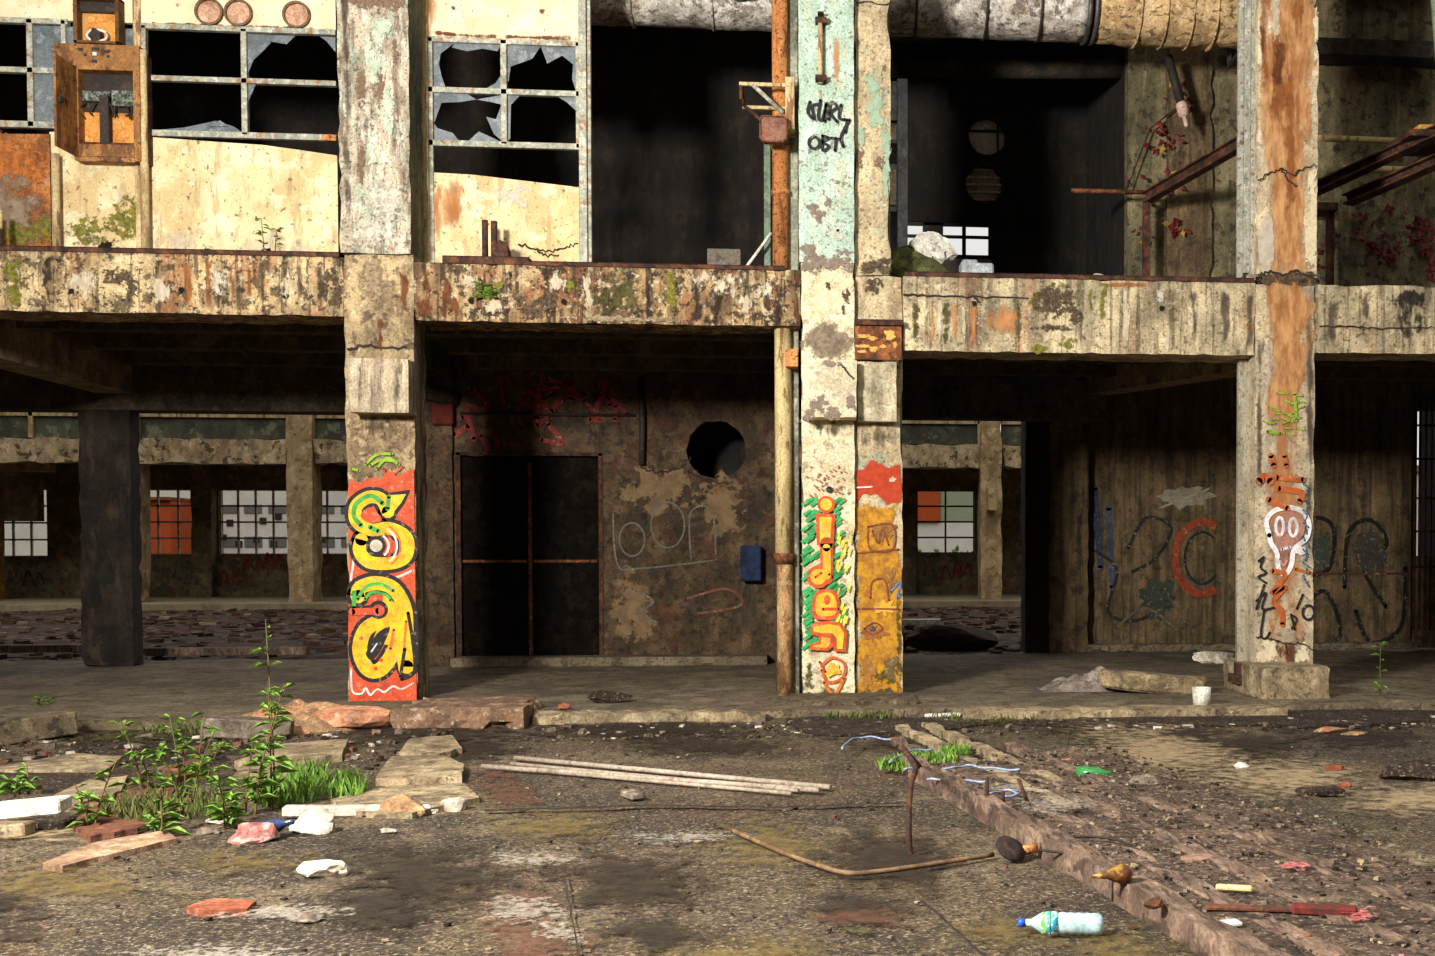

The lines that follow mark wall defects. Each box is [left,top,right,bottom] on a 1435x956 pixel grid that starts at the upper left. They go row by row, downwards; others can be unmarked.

peeling [340,0,405,189]
corrosion [0,133,51,191]
crack [1258,163,1318,187]
peeling [806,180,840,223]
spalling [98,269,138,301]
spalling [511,289,559,319]
water stain [912,303,920,342]
water stain [937,301,966,343]
water stain [1221,293,1229,339]
corrosion [1250,0,1315,529]
water stain [1307,303,1337,463]
corrosion [1271,547,1300,636]